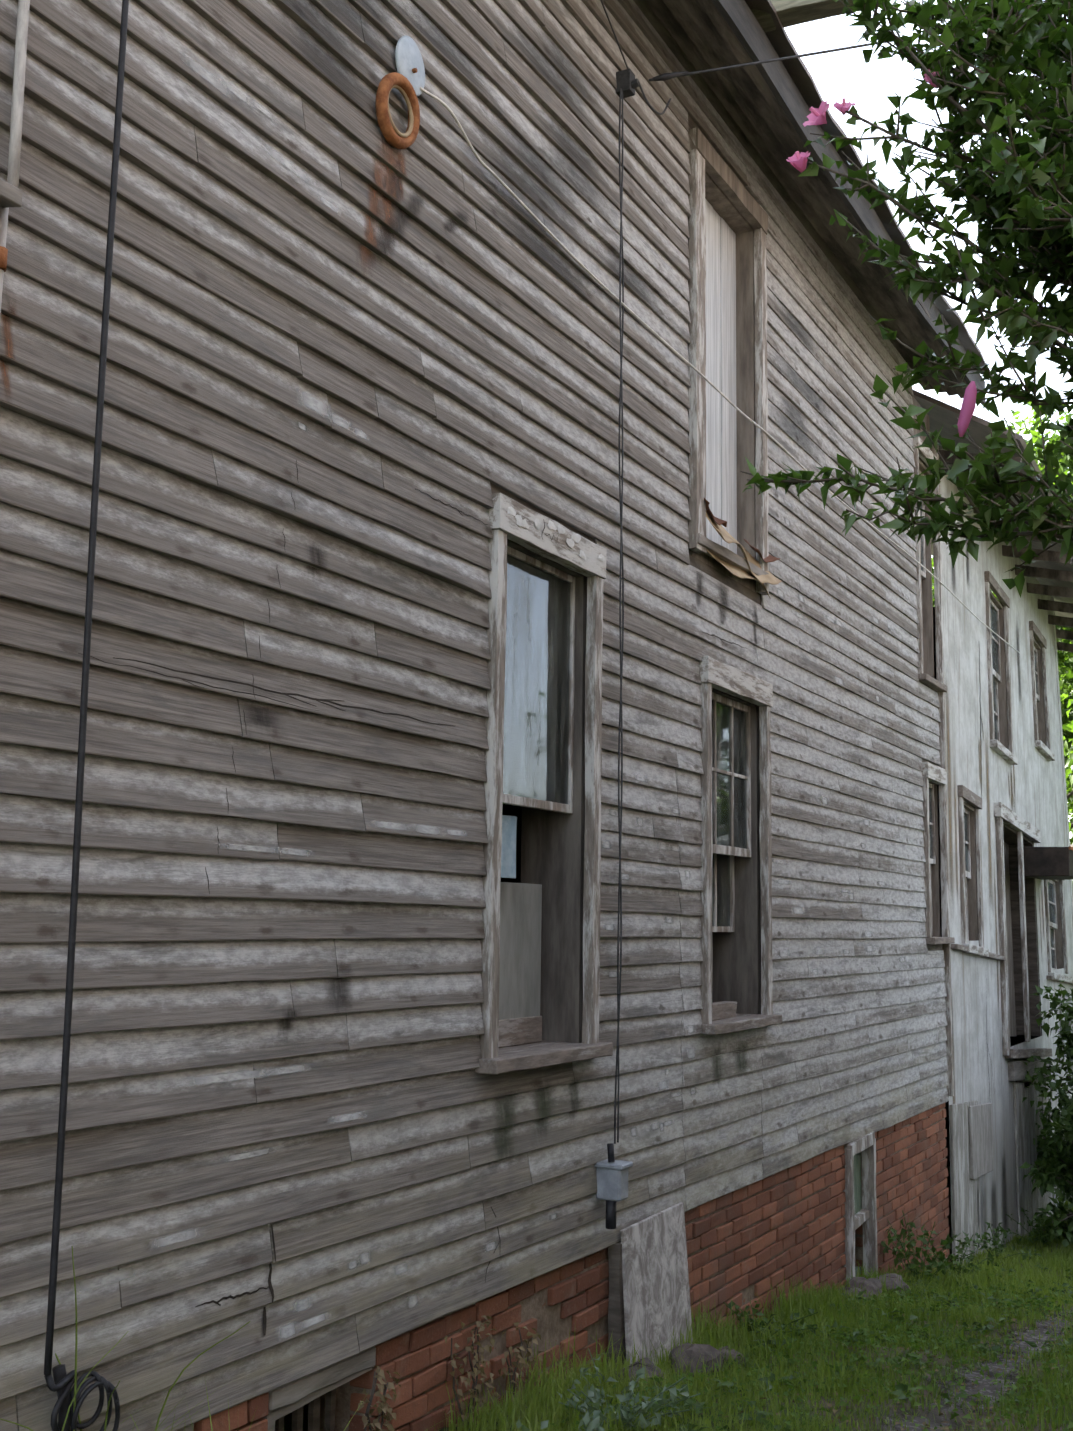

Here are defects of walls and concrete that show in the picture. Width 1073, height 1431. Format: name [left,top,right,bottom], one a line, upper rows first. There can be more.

rust [362,72,420,255]
crack [195,1225,276,1335]